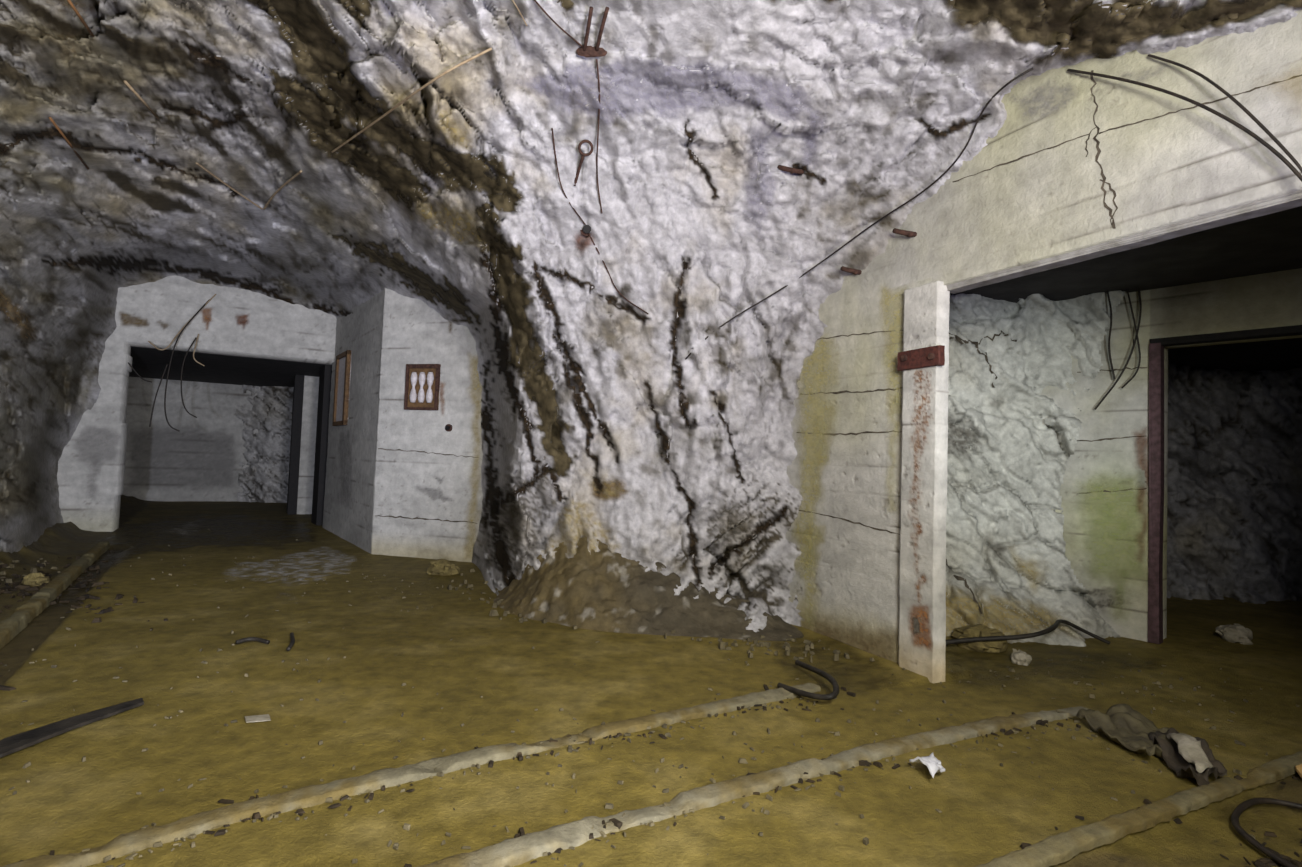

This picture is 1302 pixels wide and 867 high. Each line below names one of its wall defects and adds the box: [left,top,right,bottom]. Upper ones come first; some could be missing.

crack [952,70,1302,229]
rust [910,576,931,648]